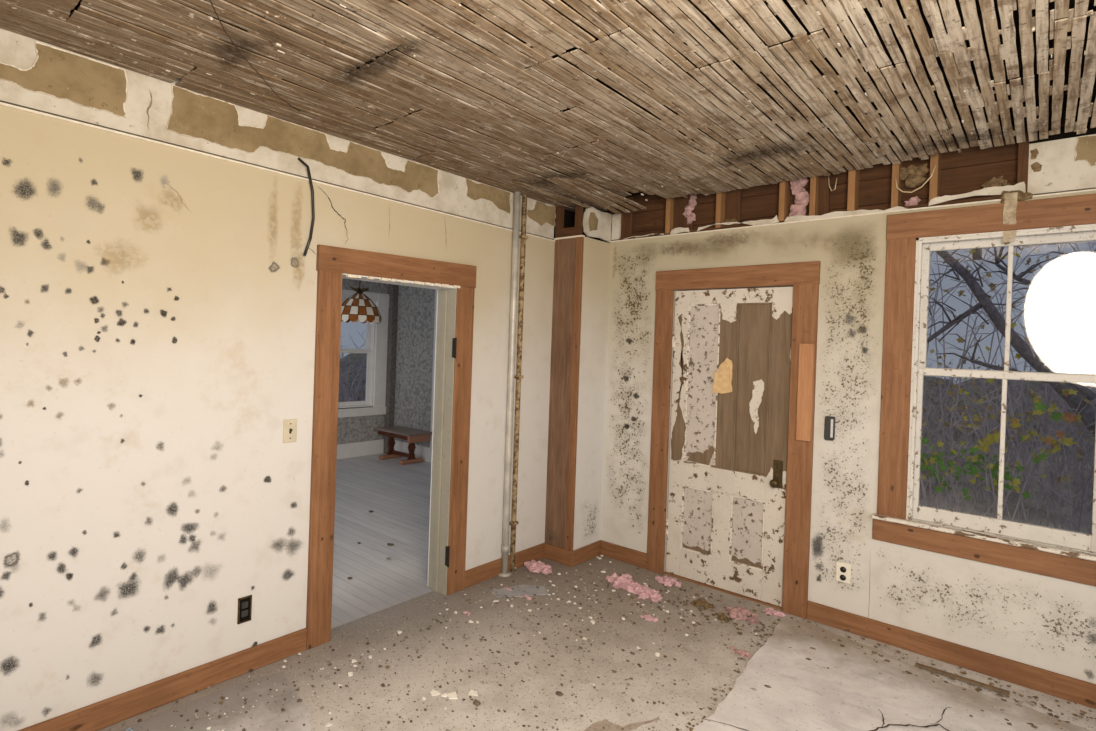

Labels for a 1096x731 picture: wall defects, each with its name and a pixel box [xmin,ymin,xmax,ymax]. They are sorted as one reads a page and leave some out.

peeling [0,41,128,118]
peeling [166,85,439,198]
peeling [1074,135,1096,166]
peeling [466,178,511,214]
peeling [527,201,556,227]
damp [79,297,138,352]
damp [608,244,653,533]
damp [813,236,877,590]
damp [49,548,78,580]
damp [96,552,145,599]
damp [165,568,201,599]
crack [869,707,950,731]